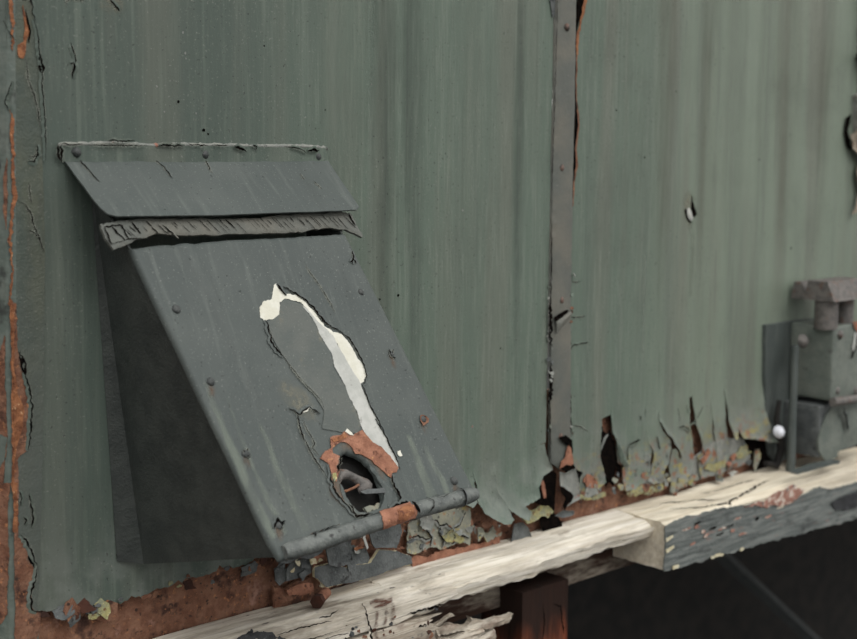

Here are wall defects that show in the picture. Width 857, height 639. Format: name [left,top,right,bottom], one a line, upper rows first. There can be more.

rust [573,0,587,206]
peeling [844,114,857,153]
rust [0,112,41,639]
peeling [259,284,402,482]
rust [379,502,417,529]
peeling [241,378,779,588]
peeling [744,484,804,521]
peeling [831,491,857,510]
rust [271,577,314,608]
peeling [41,597,123,628]
peeling [346,616,396,638]